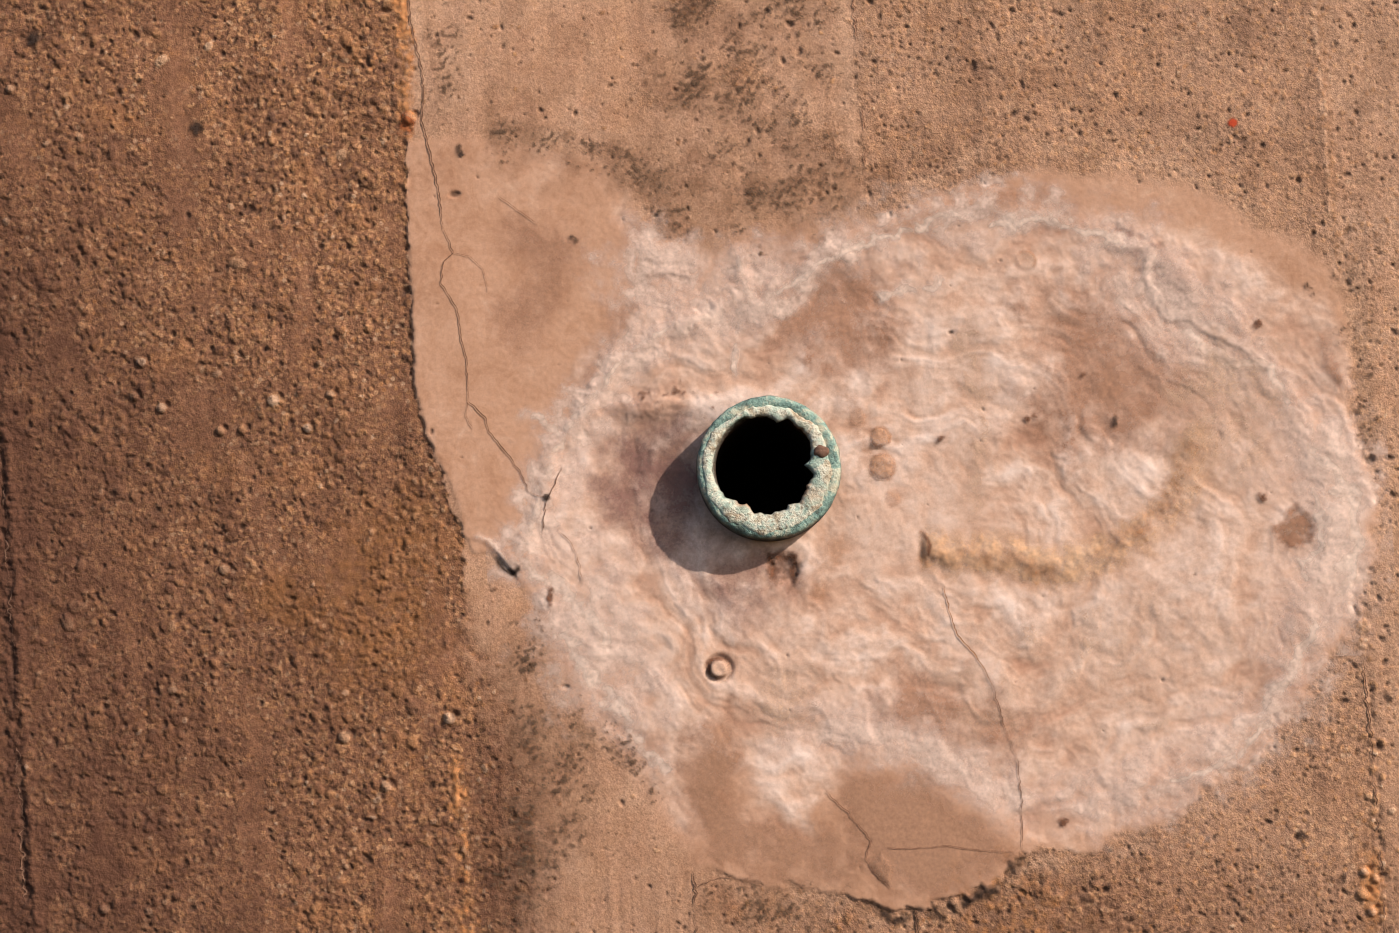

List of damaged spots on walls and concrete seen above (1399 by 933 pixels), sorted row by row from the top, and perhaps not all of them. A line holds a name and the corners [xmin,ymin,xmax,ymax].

crack [408,0,582,577]
crack [827,590,1023,887]
water stain [485,0,1387,933]